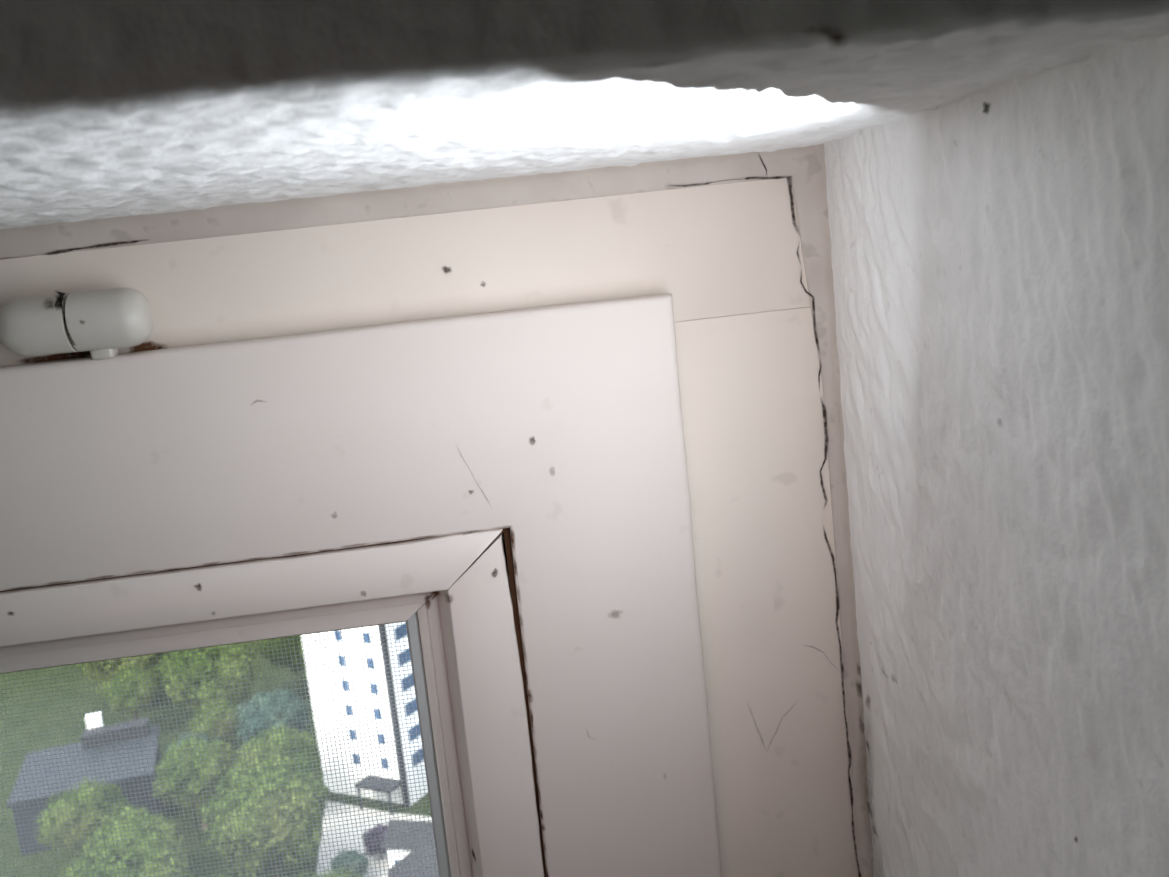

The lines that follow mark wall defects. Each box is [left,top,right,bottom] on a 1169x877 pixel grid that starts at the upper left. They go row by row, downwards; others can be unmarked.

crack [675,157,828,501]
crack [824,531,861,877]